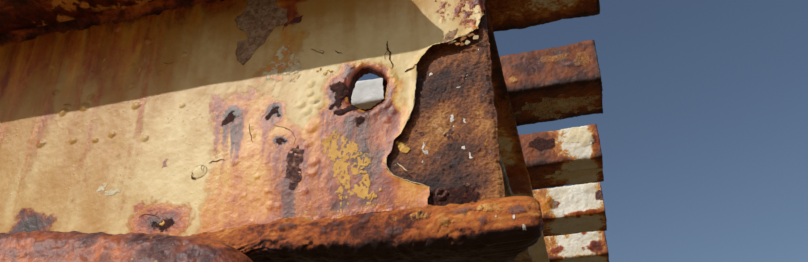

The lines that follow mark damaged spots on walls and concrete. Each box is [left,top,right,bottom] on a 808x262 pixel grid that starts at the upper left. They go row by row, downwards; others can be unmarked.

peeling [235,0,304,65]
peeling [257,45,301,81]
corrosion [125,0,430,236]
corrosion [494,96,516,131]
peeling [321,130,382,218]
corrosion [505,162,560,215]
corrosion [7,207,58,234]
corrosion [565,208,606,219]
corrosion [581,232,607,256]